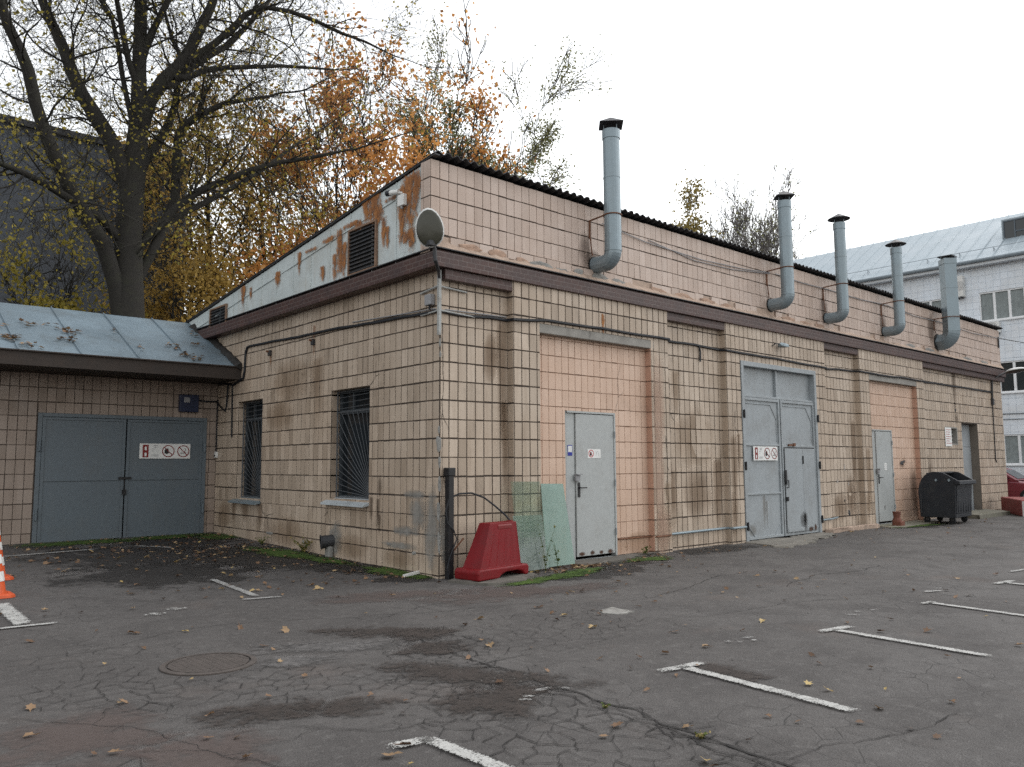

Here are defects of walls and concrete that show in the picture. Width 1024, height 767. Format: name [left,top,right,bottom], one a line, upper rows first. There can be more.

rust [297,168,421,281]